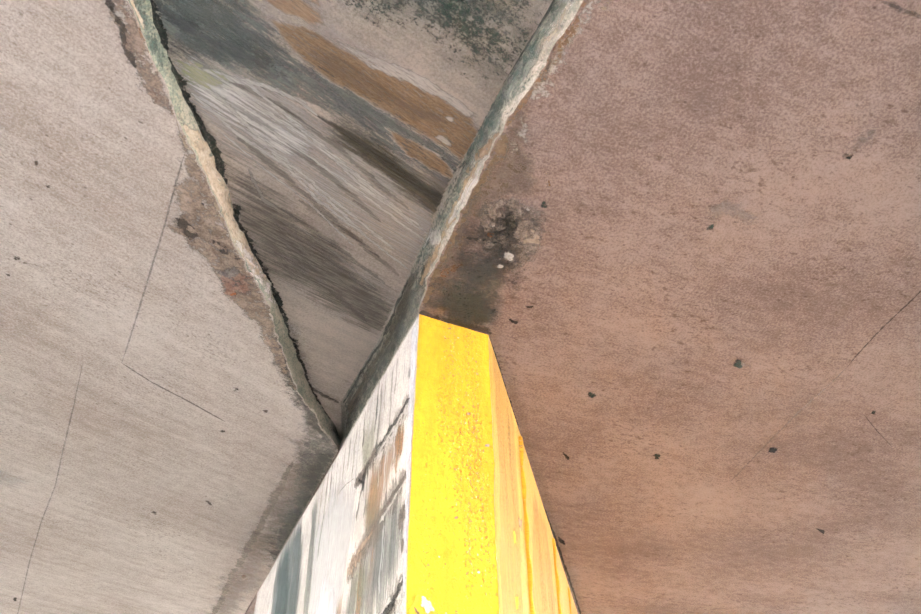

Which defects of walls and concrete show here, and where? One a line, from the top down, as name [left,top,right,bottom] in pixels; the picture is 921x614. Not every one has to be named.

peeling [530,0,610,100]
crack [883,1,920,18]
spalling [105,0,297,391]
crack [150,0,339,419]
spalling [457,197,546,288]
damp [154,0,555,614]
crack [123,364,225,422]
damp [543,506,581,614]